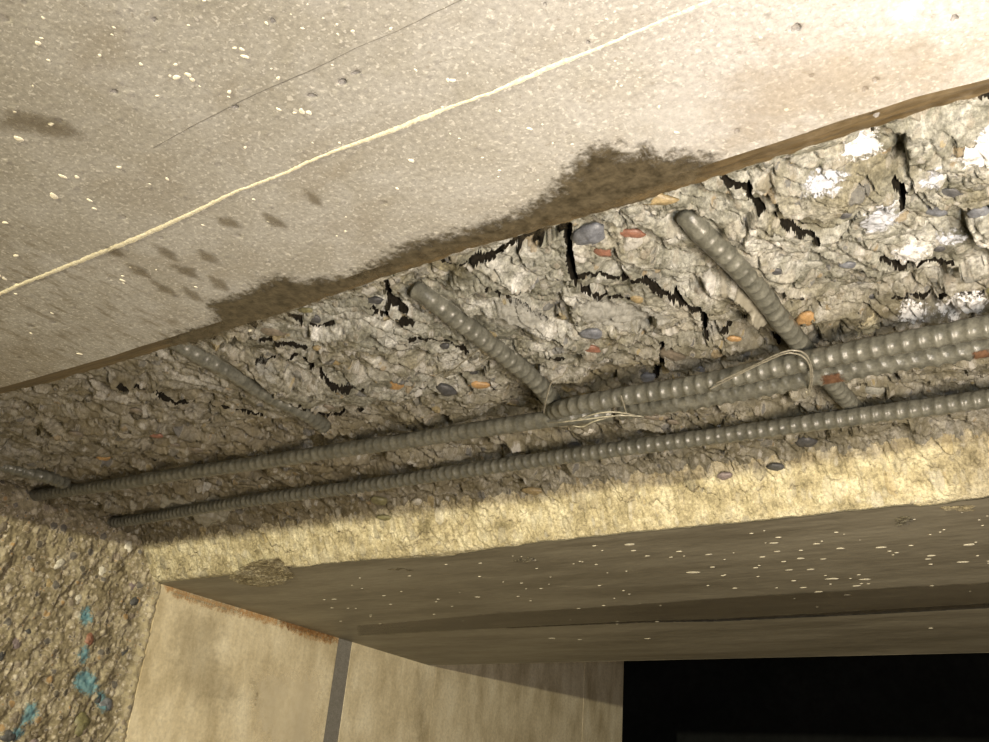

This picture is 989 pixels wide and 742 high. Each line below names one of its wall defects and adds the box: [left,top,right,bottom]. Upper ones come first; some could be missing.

crack [370,280,469,355]
damp [163,140,715,346]
spalling [0,96,989,489]
crack [441,222,747,341]
crack [721,174,821,247]
crack [772,331,781,345]
damp [804,167,850,198]
damp [840,127,885,162]
damp [891,240,928,264]
damp [898,290,988,325]
damp [951,126,989,174]
spalling [0,339,989,742]